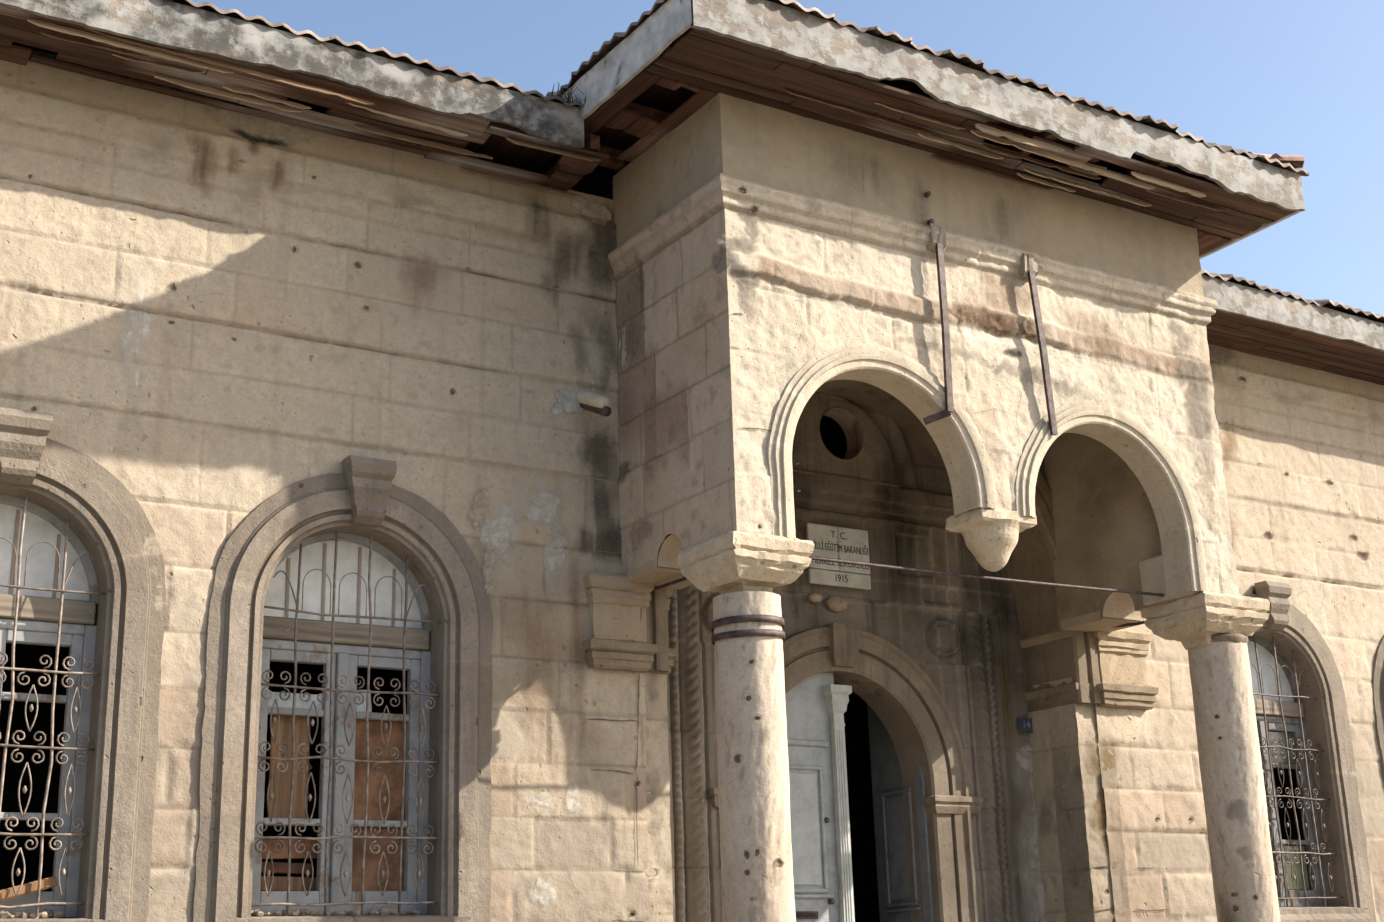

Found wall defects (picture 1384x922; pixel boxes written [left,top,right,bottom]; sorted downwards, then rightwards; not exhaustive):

water stain [235,129,284,145]
water stain [581,415,628,557]